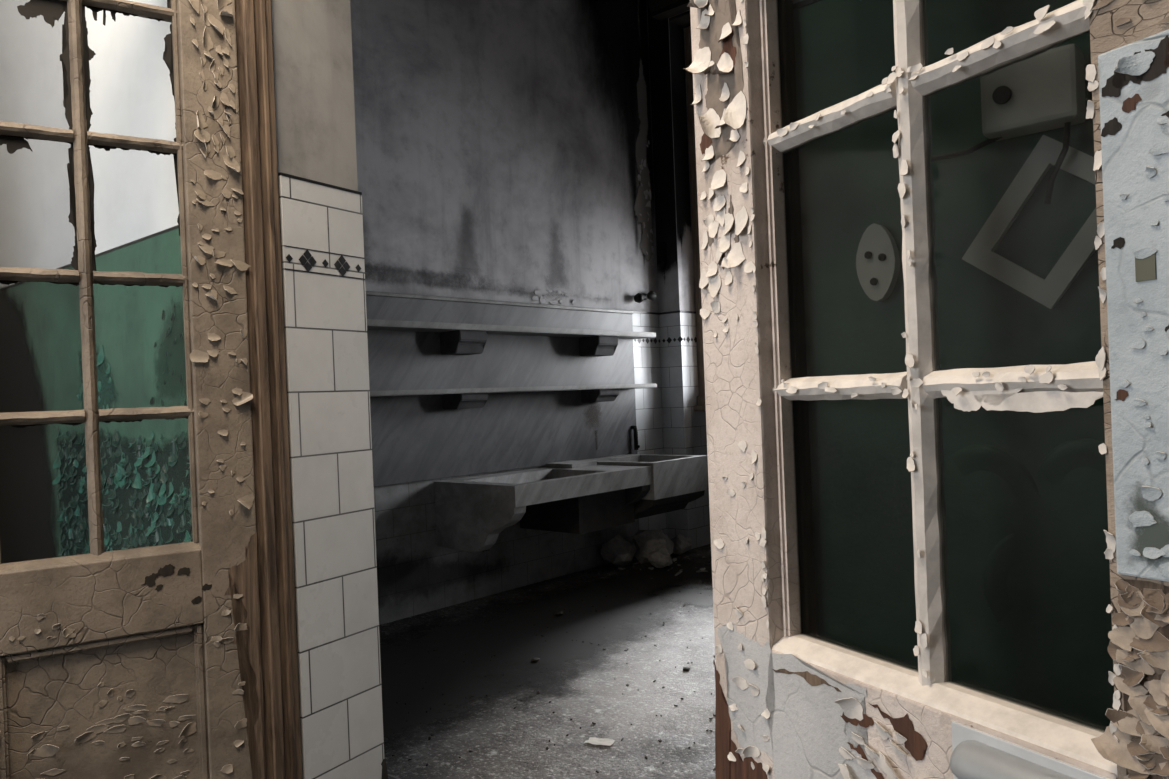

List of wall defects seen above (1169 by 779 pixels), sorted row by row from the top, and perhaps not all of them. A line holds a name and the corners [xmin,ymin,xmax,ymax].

peeling [189,0,250,301]
water stain [623,0,691,279]
peeling [684,0,756,338]
peeling [865,63,923,97]
peeling [892,110,908,199]
peeling [944,26,1015,72]
peeling [1033,5,1056,34]
peeling [1086,35,1169,178]
water stain [365,265,484,289]
peeling [1094,222,1157,259]
peeling [941,346,1152,428]
peeling [713,561,928,779]